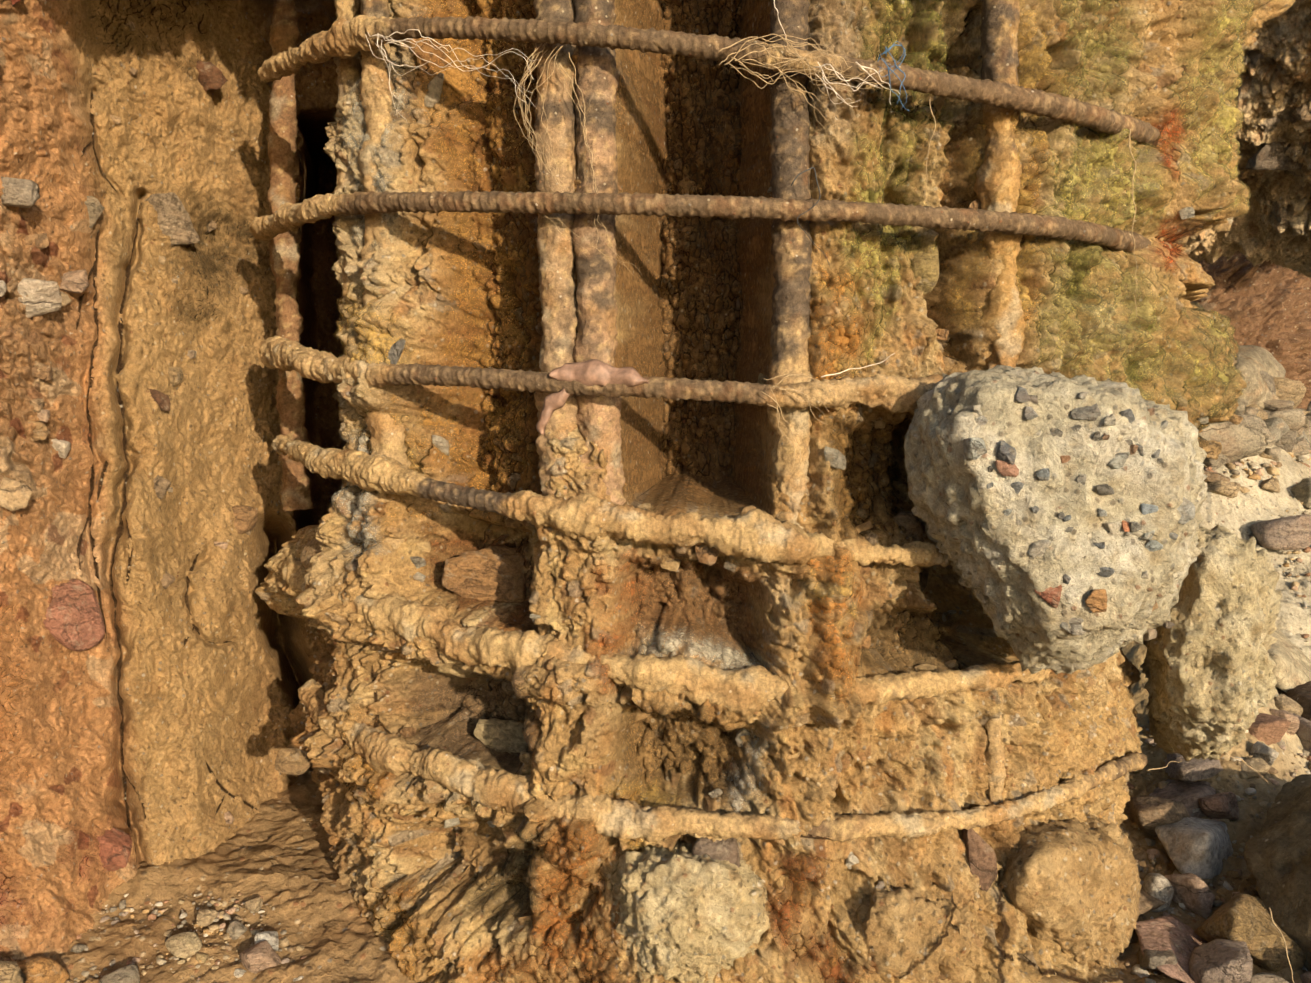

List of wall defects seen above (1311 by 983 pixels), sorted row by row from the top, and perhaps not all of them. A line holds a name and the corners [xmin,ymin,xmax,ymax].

corrosion [415,38,537,193]
spalling [615,49,772,198]
corrosion [440,211,535,371]
spalling [616,214,771,384]
corrosion [1013,234,1042,321]
leakage [1053,246,1121,341]
corrosion [385,387,536,492]
spalling [621,397,763,515]
spalling [634,543,760,653]
spalling [623,705,756,799]
crack [899,895,960,979]
crack [996,885,1124,983]